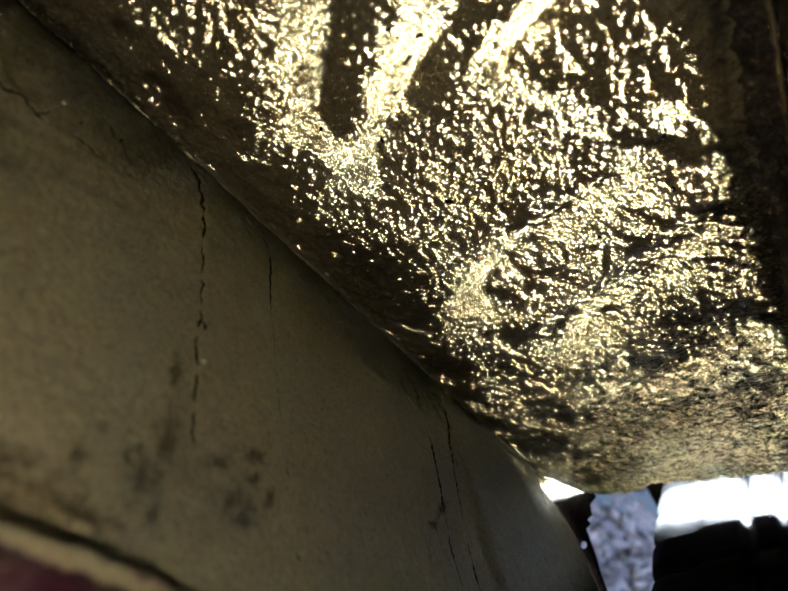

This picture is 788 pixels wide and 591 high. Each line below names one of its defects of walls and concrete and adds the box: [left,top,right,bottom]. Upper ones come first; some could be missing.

crack [187,161,207,443]
crack [253,220,290,496]
crack [409,380,481,591]